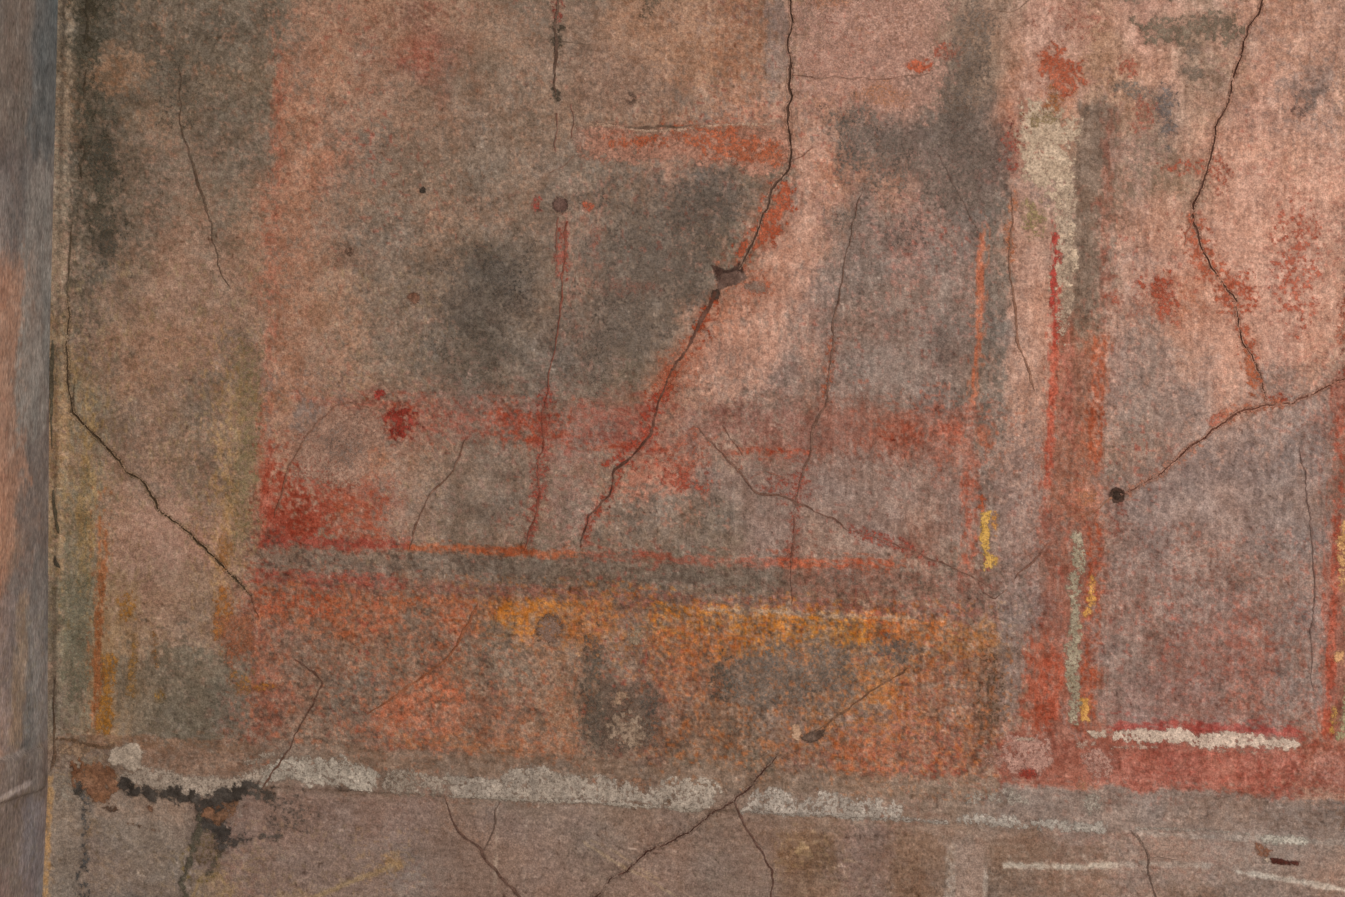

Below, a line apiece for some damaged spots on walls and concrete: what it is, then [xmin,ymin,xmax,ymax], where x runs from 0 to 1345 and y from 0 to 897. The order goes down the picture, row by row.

crack [49,222,259,617]
leakage [420,160,761,400]
crack [581,0,931,540]
crack [698,155,1048,605]
crack [1070,0,1345,518]
crack [50,676,58,770]
leakage [117,752,723,897]
crack [445,799,521,897]
crack [590,754,778,897]
leakage [740,787,1108,834]